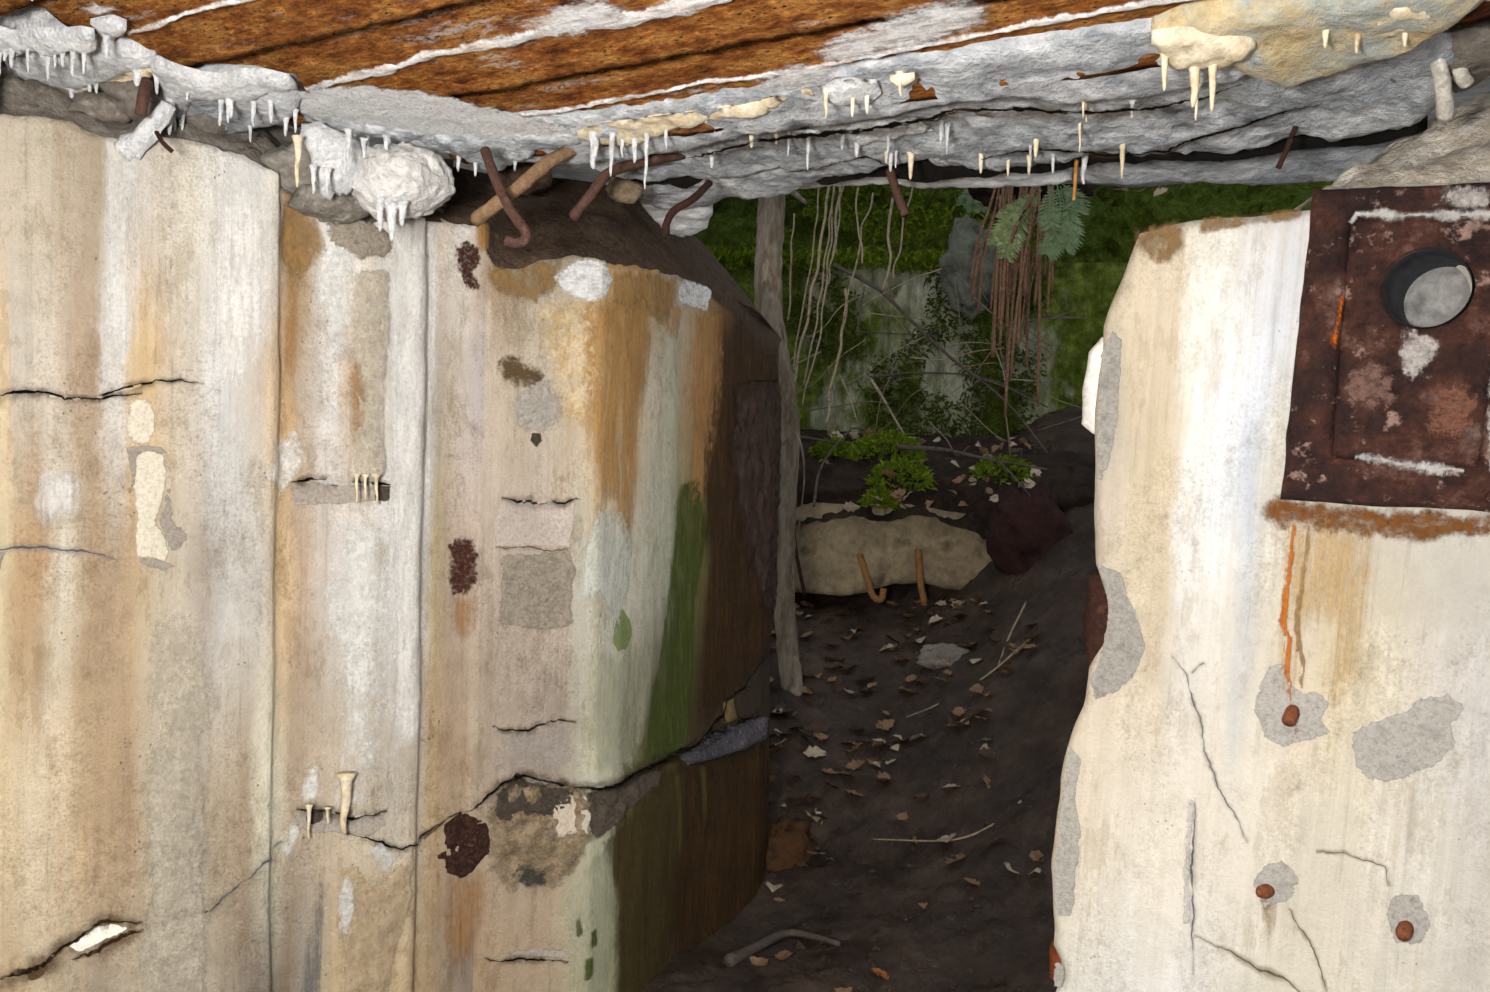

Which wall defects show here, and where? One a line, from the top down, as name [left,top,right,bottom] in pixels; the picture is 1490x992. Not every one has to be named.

water stain [1151,26,1256,121]
spalling [515,0,1490,239]
crack [0,379,204,401]
water stain [0,0,1194,766]
rust [1343,363,1395,409]
water stain [1399,330,1439,378]
rust [1265,497,1490,701]
spalling [1254,664,1330,747]
spalling [1352,694,1464,782]
rust [437,813,490,878]
crack [1175,660,1327,992]
crack [1,916,146,980]